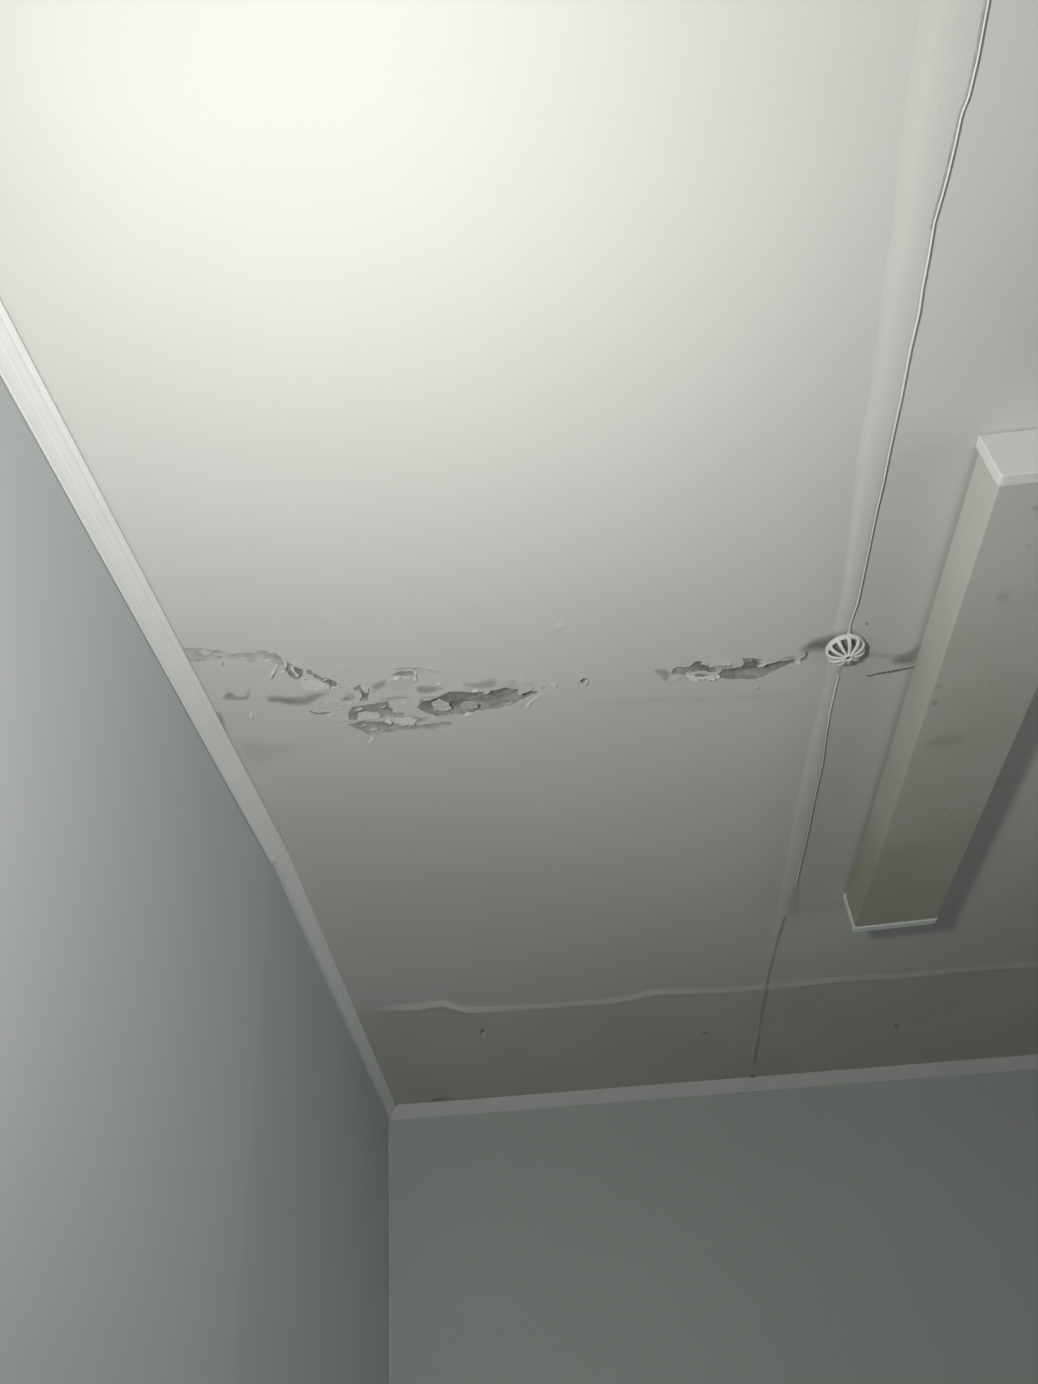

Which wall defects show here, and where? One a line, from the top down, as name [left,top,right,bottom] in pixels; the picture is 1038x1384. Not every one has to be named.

crack [849,0,989,628]
peeling [184,648,557,743]
peeling [669,651,809,690]
crack [753,667,914,1065]